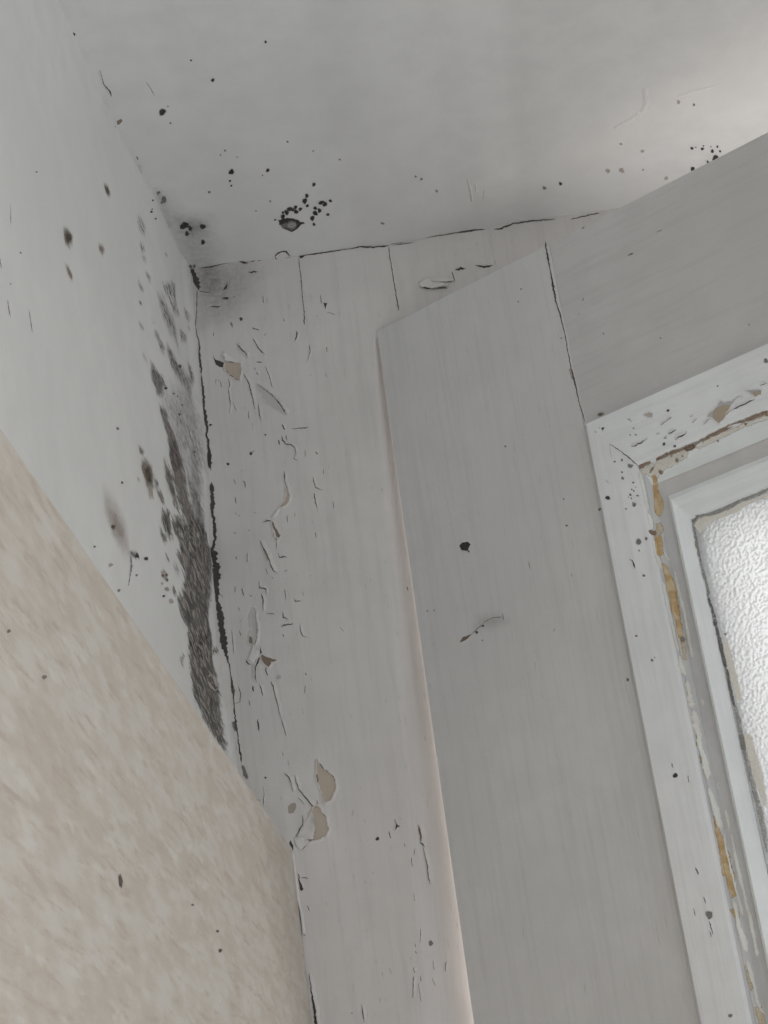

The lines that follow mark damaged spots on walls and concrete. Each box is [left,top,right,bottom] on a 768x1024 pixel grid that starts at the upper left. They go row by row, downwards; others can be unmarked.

leakage [161,284,186,338]
leakage [180,222,206,244]
peeling [213,317,290,416]
leakage [274,183,332,232]
crack [299,213,599,422]
peeling [418,263,493,289]
leakage [140,336,226,750]
crack [190,260,334,806]
peeling [232,471,292,684]
peeling [627,380,768,660]
peeling [282,752,339,935]
peeling [713,815,740,918]